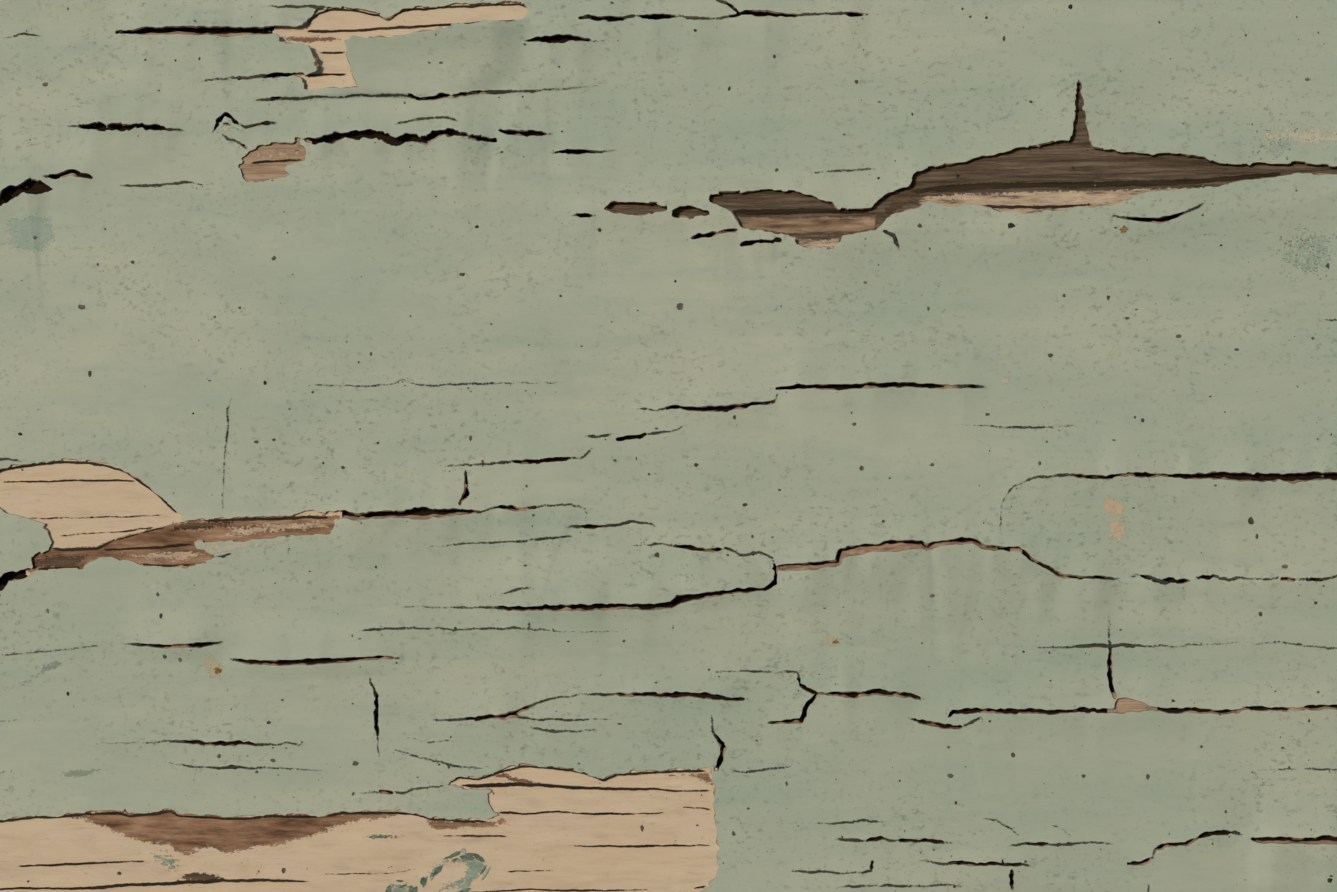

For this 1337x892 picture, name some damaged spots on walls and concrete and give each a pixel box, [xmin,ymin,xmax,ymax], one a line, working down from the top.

peeling [273,2,529,91]
crack [525,0,868,43]
crack [0,170,202,206]
peeling [239,138,312,182]
peeling [607,82,1337,248]
peeling [0,459,342,576]
crack [106,382,1337,794]
crack [2,645,95,656]
peeling [0,764,720,892]
crack [792,818,1337,892]